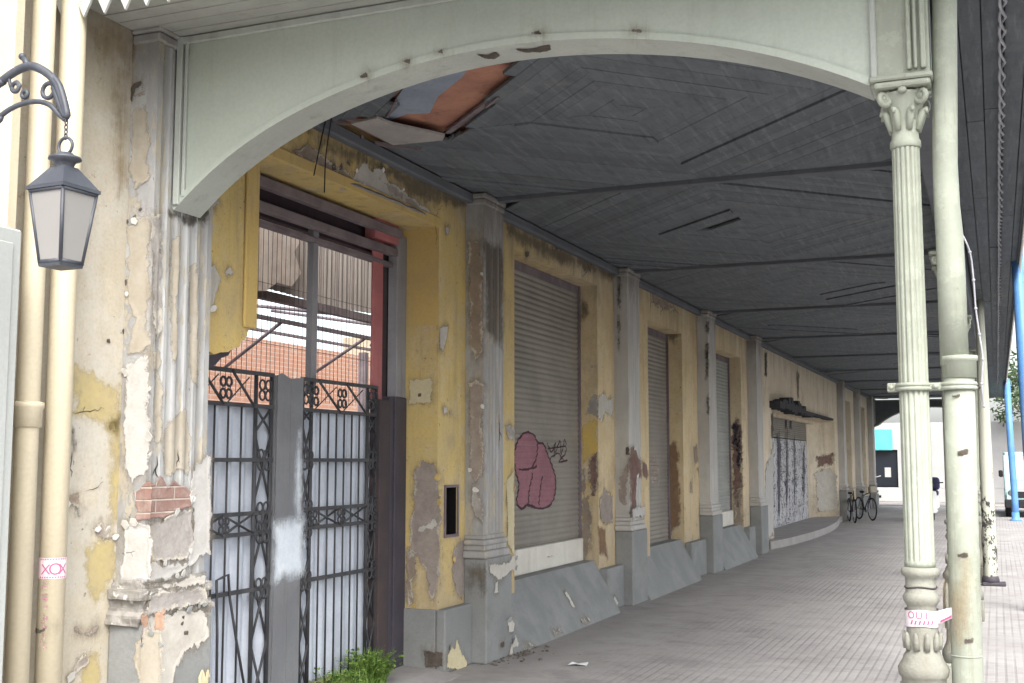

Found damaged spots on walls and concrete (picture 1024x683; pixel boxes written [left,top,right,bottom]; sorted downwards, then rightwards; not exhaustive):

spalling [295,143,430,213]
peeling [73,208,233,601]
peeling [405,461,465,607]
peeling [468,379,484,522]
peeling [489,472,518,593]
peeling [581,394,649,556]
water stain [731,422,743,468]
peeling [814,468,839,512]
peeling [133,598,210,683]